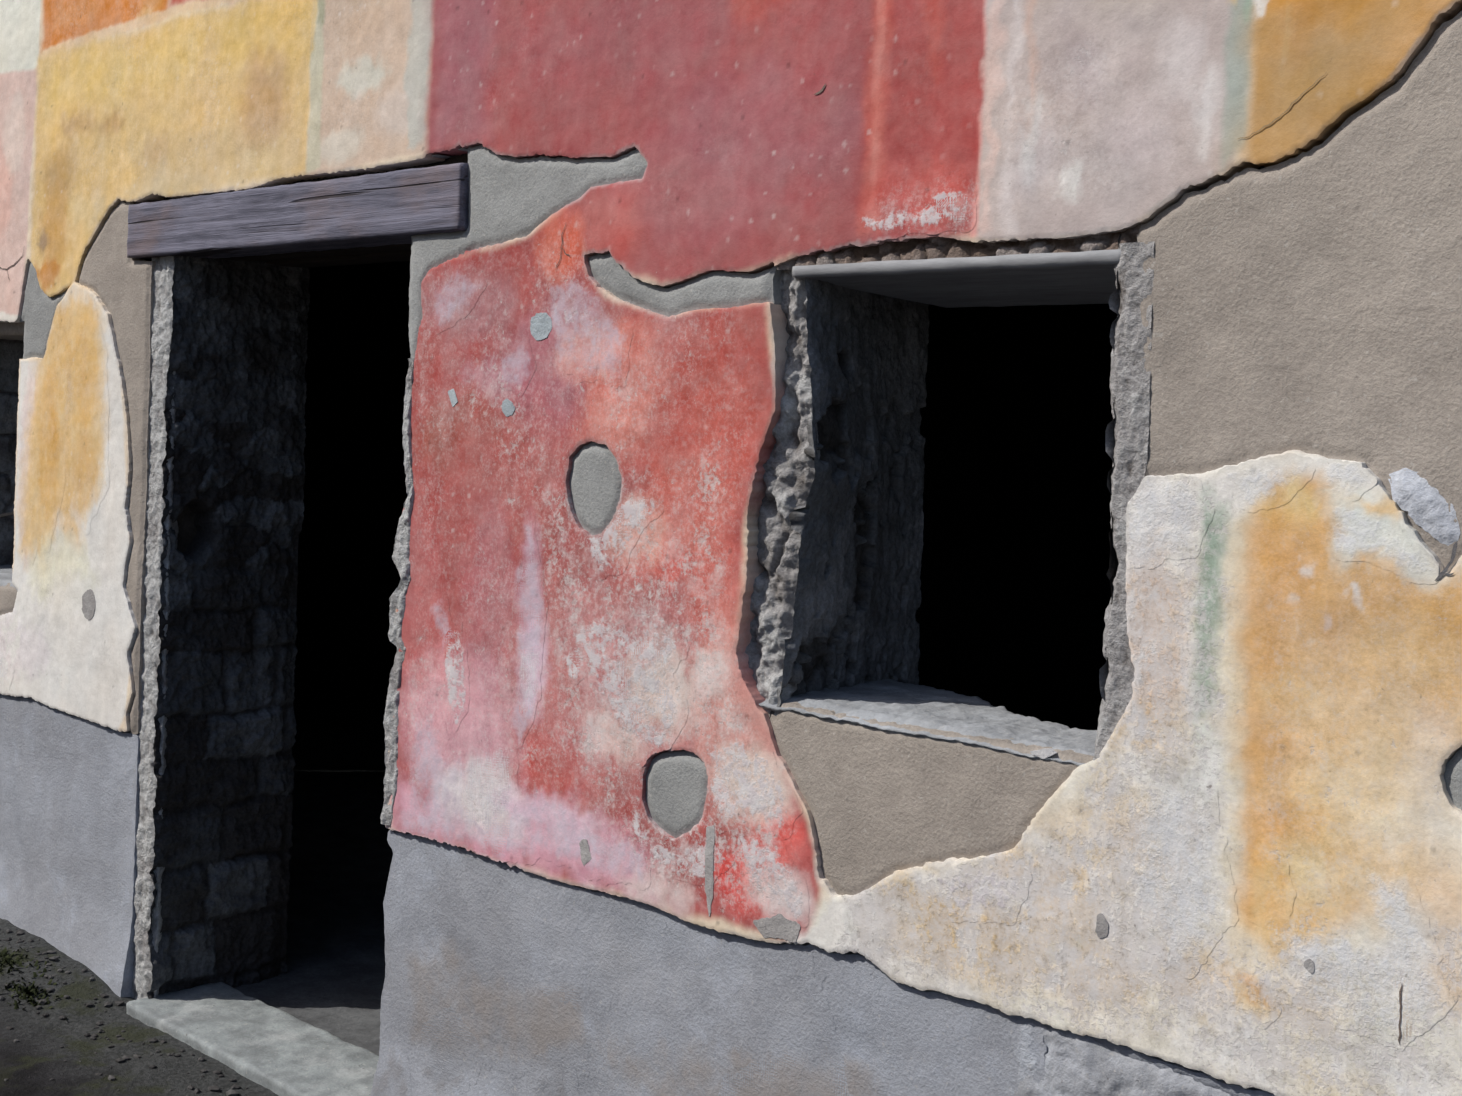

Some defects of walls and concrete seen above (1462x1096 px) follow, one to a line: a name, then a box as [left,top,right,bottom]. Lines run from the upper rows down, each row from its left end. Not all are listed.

flaking render [380,144,647,826]
flaking render [588,11,1462,917]
damp [579,489,664,581]
spalling [19,201,179,1000]
damp [370,517,921,1096]
spalling [579,839,591,865]
spalling [753,914,801,943]
spalling [1095,913,1109,938]
spalling [1303,958,1315,974]
damp [995,1014,1048,1096]
spalling [1014,1024,1230,1096]